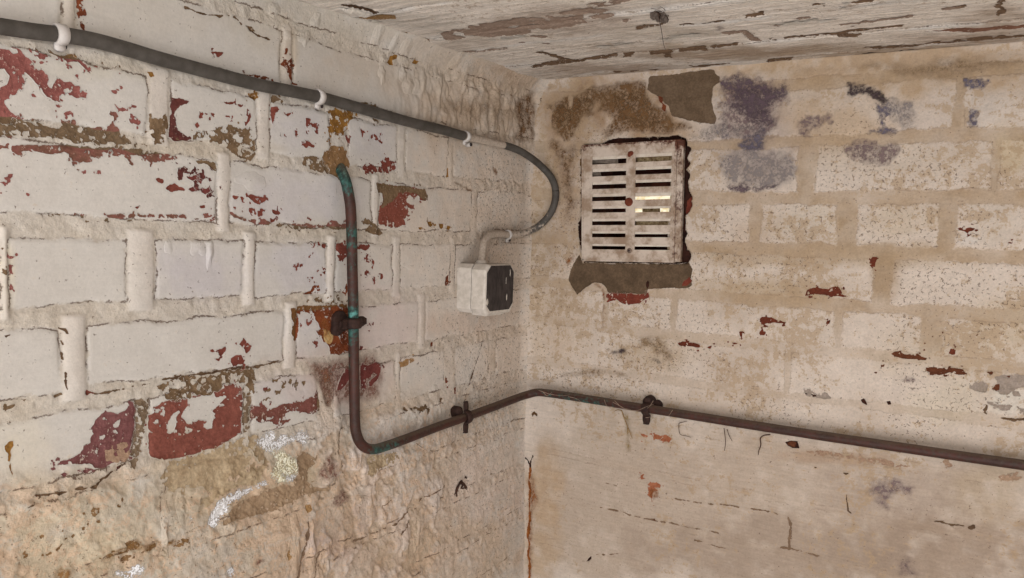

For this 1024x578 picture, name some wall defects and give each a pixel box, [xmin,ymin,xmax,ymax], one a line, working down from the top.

spalling [426,0,666,68]
spalling [649,0,1024,58]
peeling [0,46,293,223]
damp [702,75,794,192]
damp [800,116,833,137]
damp [845,82,913,164]
peeling [229,102,452,328]
peeling [757,315,786,338]
peeling [805,285,852,302]
peeling [874,332,1024,415]
peeling [51,338,330,526]
damp [208,430,308,528]